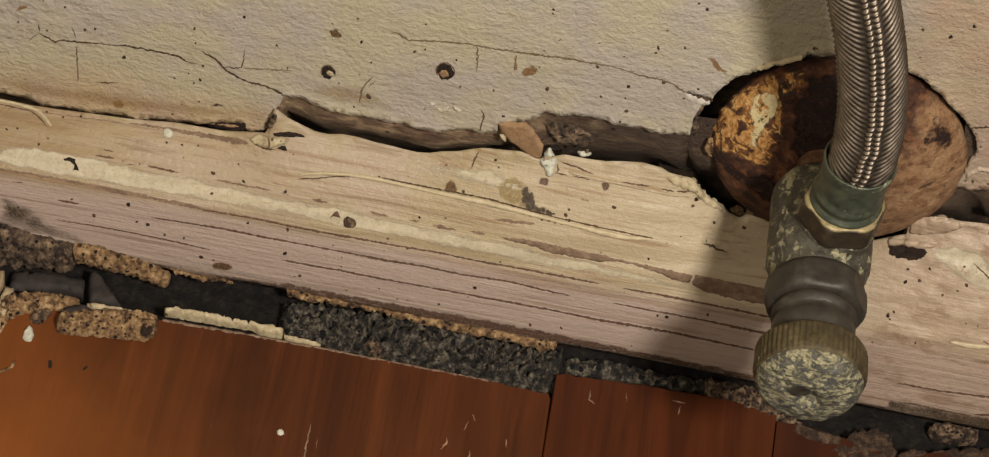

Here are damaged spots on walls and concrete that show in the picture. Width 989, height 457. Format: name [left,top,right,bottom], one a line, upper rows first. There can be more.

crack [30,25,291,96]
crack [470,110,485,169]
crack [392,31,713,102]
crack [555,161,592,180]
spalling [690,54,836,136]
rust [713,73,838,201]
spalling [908,72,966,131]
rust [924,118,951,148]